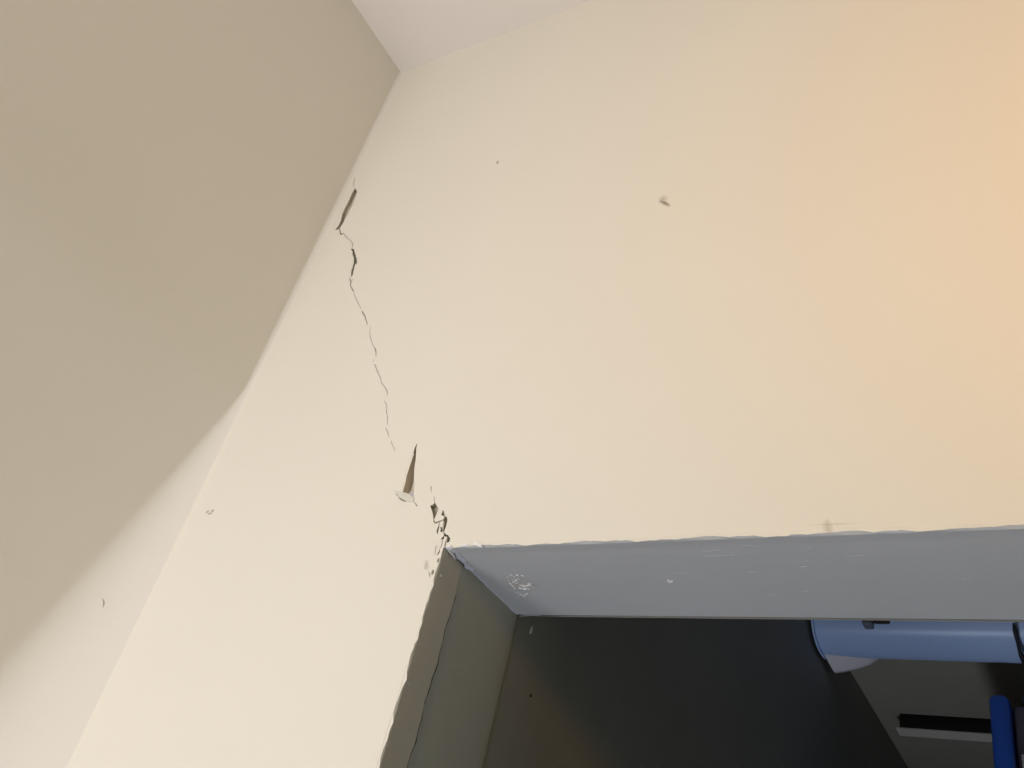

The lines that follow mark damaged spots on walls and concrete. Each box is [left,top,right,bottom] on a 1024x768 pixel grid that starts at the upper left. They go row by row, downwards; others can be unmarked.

crack [339,229,395,450]
flaking render [375,500,518,768]